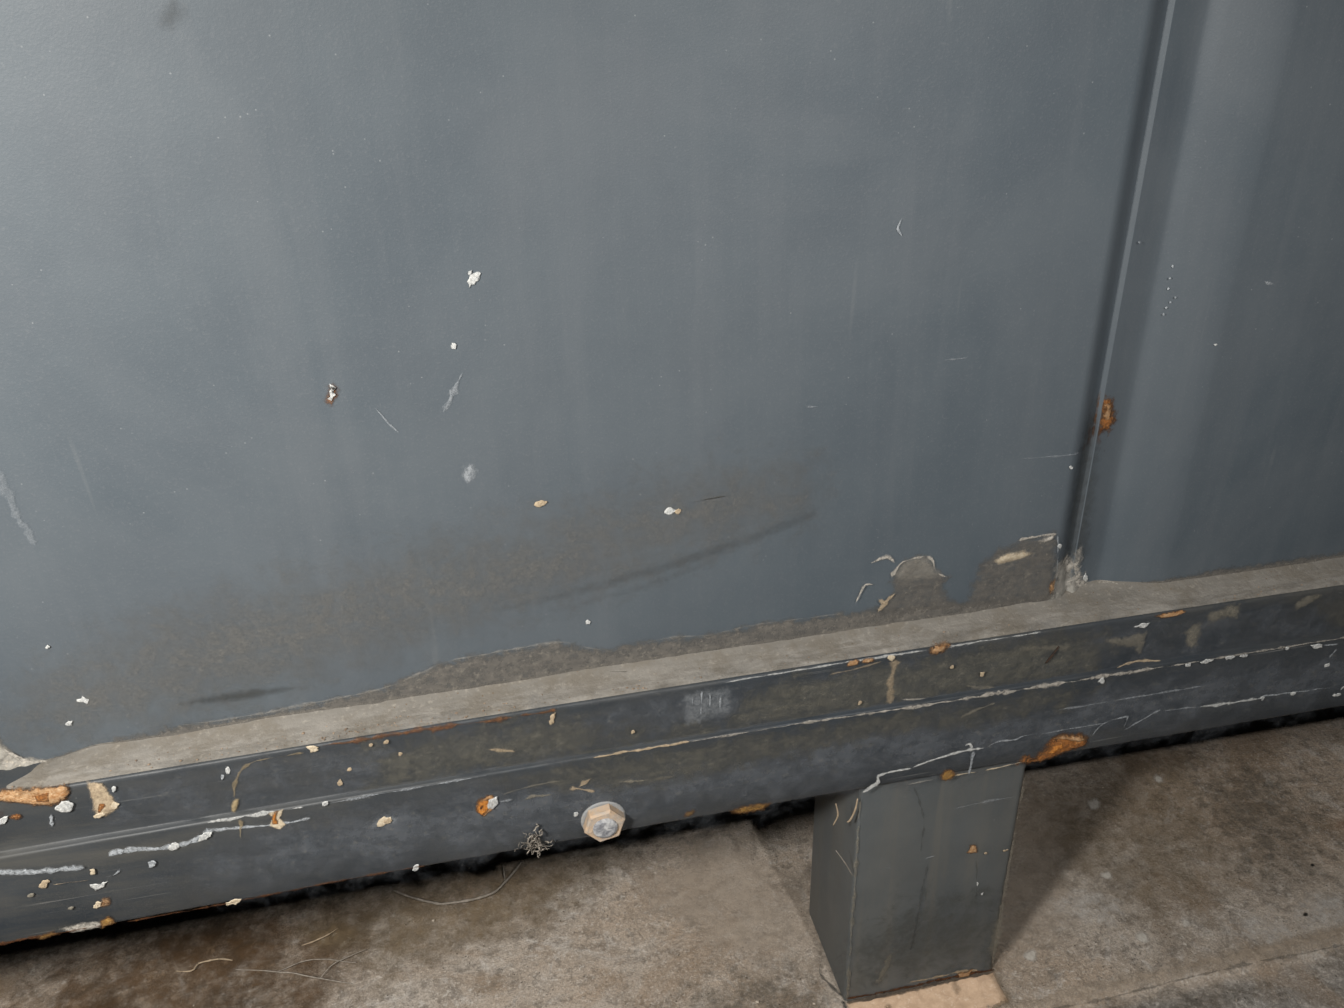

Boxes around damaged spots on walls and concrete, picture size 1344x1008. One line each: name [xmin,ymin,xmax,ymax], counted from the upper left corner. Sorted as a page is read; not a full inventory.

rust [1088,395,1116,441]
peeling [1187,606,1239,647]
peeling [1110,623,1160,668]
peeling [1185,654,1248,667]
peeling [0,745,46,770]
rust [1016,733,1088,765]
peeling [88,782,119,819]
peeling [270,809,285,829]
peeling [377,816,392,827]
peeling [476,795,507,817]
peeling [27,869,119,909]
leakage [52,870,573,1008]